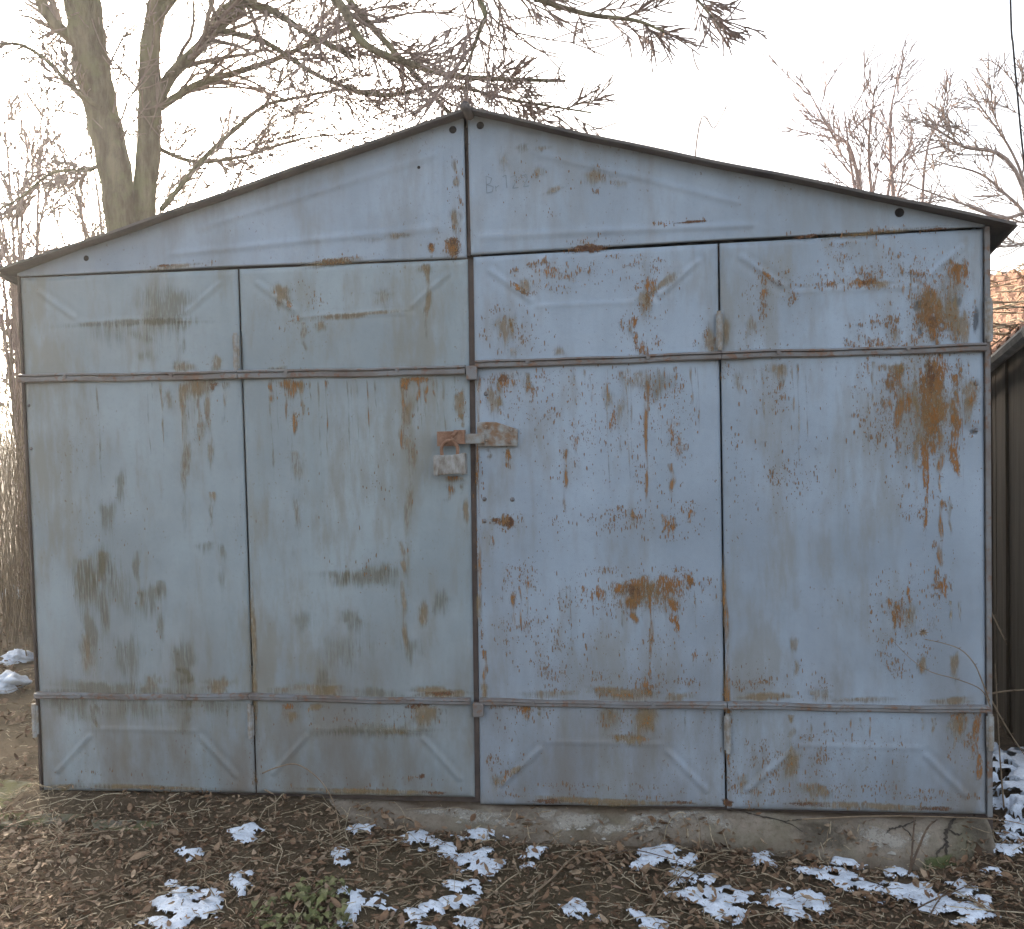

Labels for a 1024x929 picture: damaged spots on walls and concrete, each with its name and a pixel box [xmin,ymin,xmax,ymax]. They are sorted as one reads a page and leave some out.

corrosion [428,161,464,259]
corrosion [388,377,435,463]
corrosion [478,232,706,542]
corrosion [692,224,982,679]
corrosion [463,444,831,806]
corrosion [720,718,980,811]
corrosion [936,697,983,778]